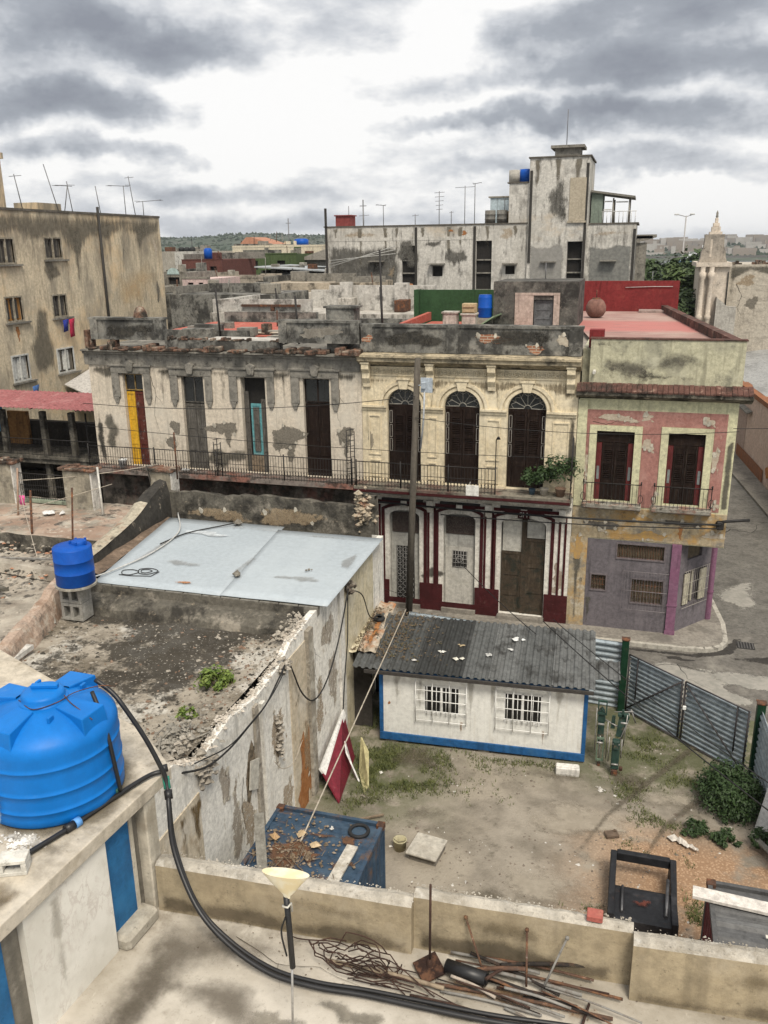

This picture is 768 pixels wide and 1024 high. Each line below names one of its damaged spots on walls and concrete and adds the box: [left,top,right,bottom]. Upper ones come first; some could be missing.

damp [549,159,568,219]
damp [0,216,158,275]
spalling [475,332,500,344]
spalling [525,343,544,355]
damp [609,358,692,378]
peeling [595,411,654,423]
damp [98,416,118,461]
flaking render [272,709,287,766]
rust [298,767,310,808]